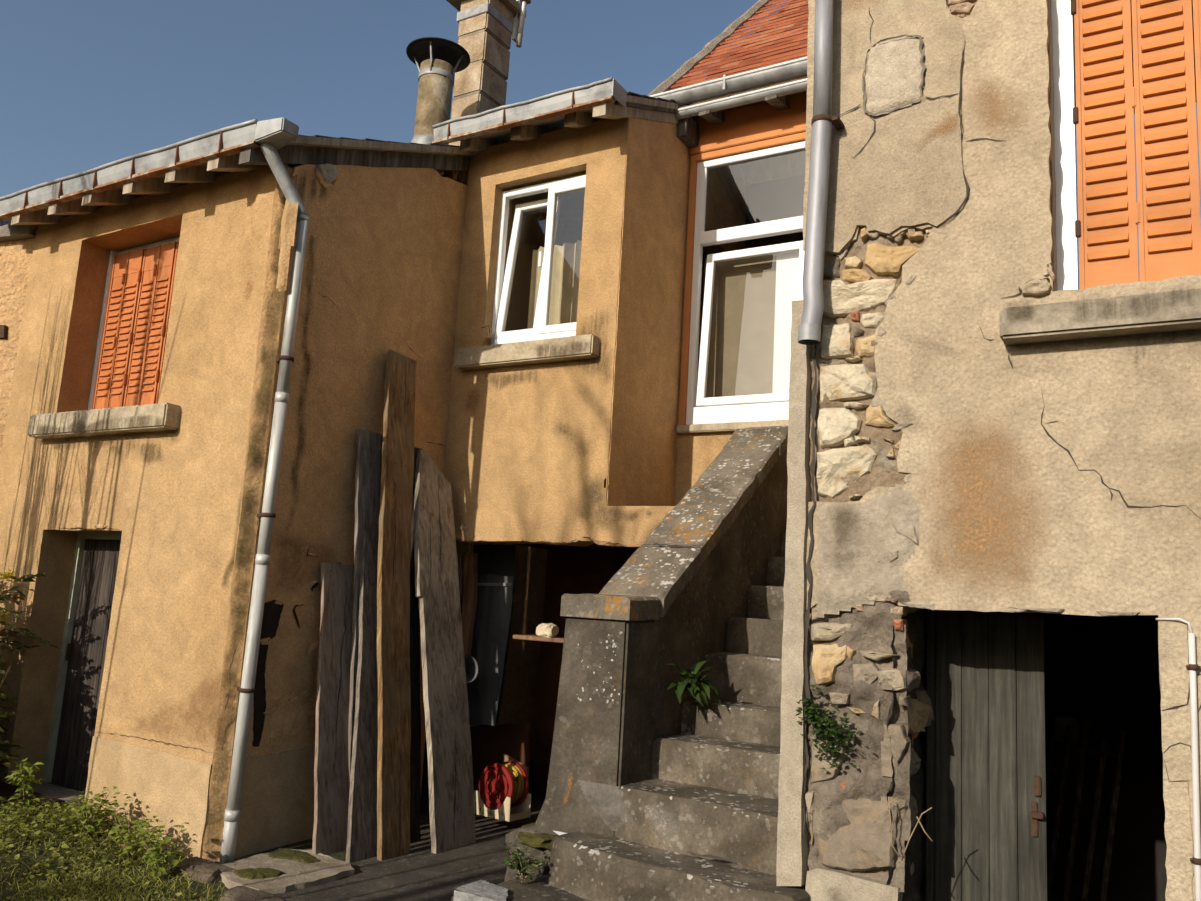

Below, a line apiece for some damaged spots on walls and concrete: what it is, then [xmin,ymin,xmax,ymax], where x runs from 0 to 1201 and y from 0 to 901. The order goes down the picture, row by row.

flaking render [947,0,978,18]
crack [839,105,876,157]
crack [921,44,1004,142]
crack [938,171,969,226]
flaking render [793,94,966,892]
damp [944,437,1027,572]
crack [1041,388,1201,519]